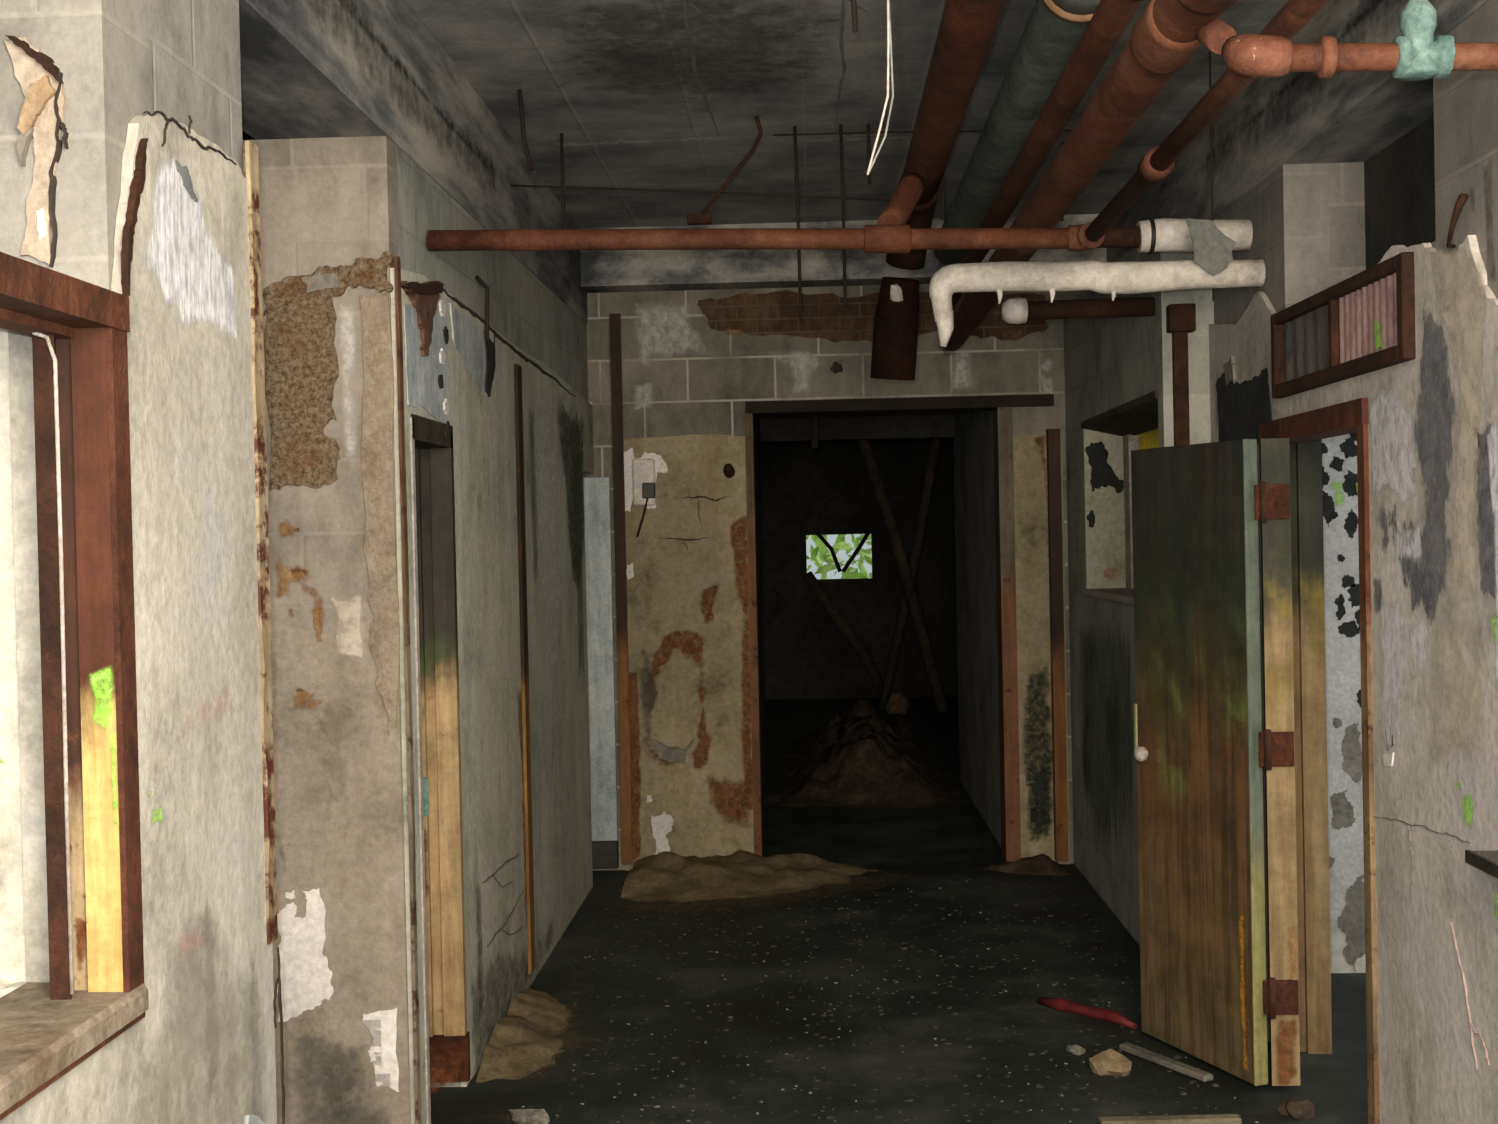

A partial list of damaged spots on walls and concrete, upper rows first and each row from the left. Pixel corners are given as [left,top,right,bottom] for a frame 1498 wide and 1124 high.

peeling [4,35,66,264]
crack [143,111,237,165]
leakage [577,0,803,90]
rust [277,564,324,642]
peeling [277,888,334,1022]
spalling [263,251,496,736]
rust [629,585,718,859]
rust [693,517,753,823]
leakage [1024,667,1053,839]
peeling [1322,312,1454,971]
crack [1374,816,1470,902]
leakage [1432,251,1494,604]